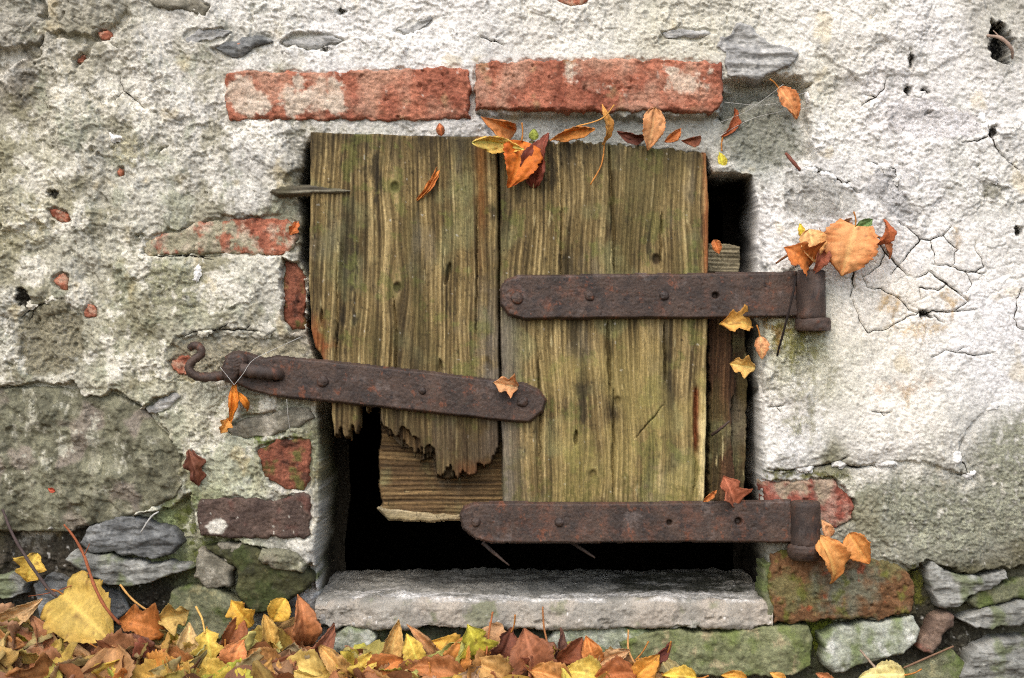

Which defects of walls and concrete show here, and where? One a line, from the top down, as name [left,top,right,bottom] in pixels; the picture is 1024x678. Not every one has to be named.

crack [968,124,1018,169]
spalling [145,259,202,315]
crack [850,223,984,333]
crack [769,457,873,474]